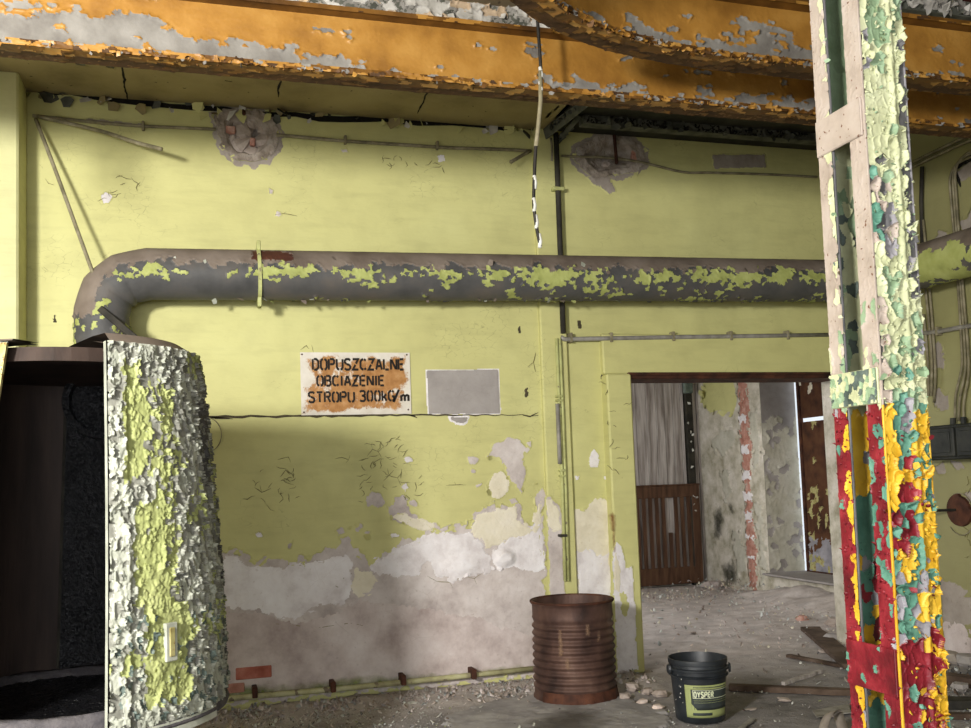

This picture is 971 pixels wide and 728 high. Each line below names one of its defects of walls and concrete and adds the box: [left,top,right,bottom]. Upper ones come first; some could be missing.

peeling [154,51,285,70]
peeling [548,0,830,69]
flaking render [208,106,285,170]
flaking render [549,112,650,195]
peeling [862,0,971,728]
crack [246,457,299,511]
crack [209,413,538,502]
peeling [832,413,856,570]
peeling [215,436,640,709]